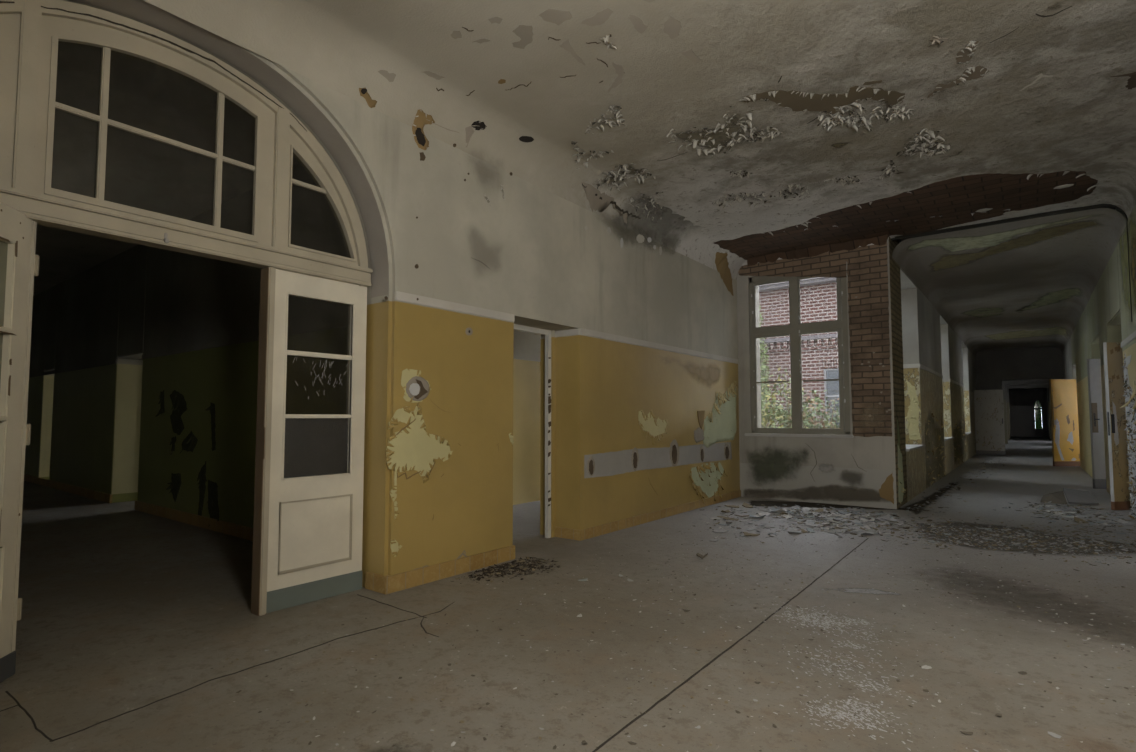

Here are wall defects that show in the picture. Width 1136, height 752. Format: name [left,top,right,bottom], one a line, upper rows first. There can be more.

spalling [412,109,435,161]
peeling [667,41,989,159]
peeling [879,128,961,181]
water stain [607,198,691,255]
flaking render [712,170,1099,485]
peeling [156,390,219,526]
peeling [386,368,453,520]
spalling [584,380,738,504]
water stain [744,448,1136,555]
peeling [1113,354,1136,521]